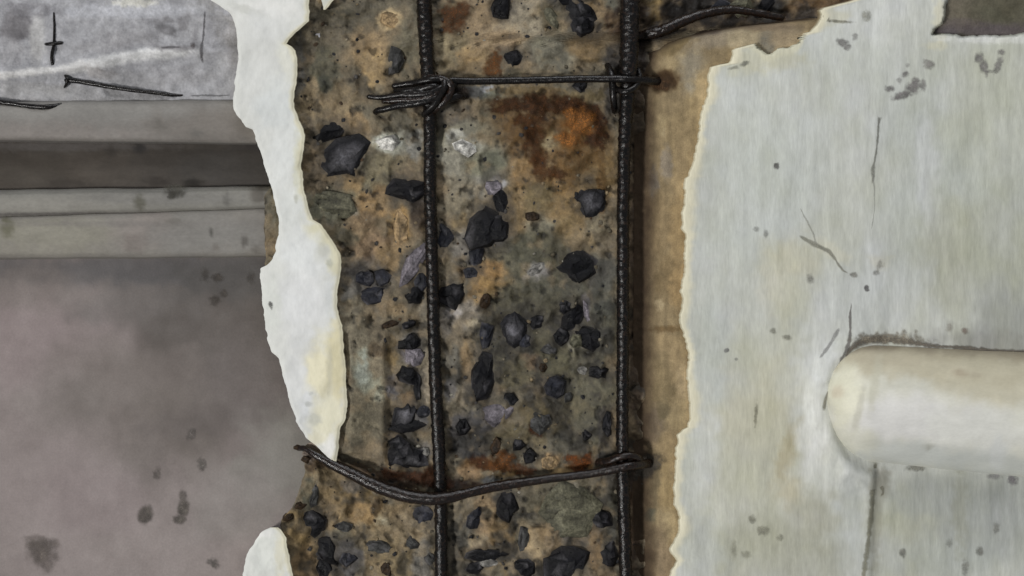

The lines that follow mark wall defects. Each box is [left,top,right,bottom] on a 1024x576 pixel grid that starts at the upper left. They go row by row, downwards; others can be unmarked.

spalling [933,0,1024,36]
corrosion [491,92,609,181]
crack [871,118,880,187]
crack [801,210,846,272]
spalling [211,0,849,576]
corrosion [381,466,454,489]
corrosion [470,451,536,475]
crack [862,465,884,576]